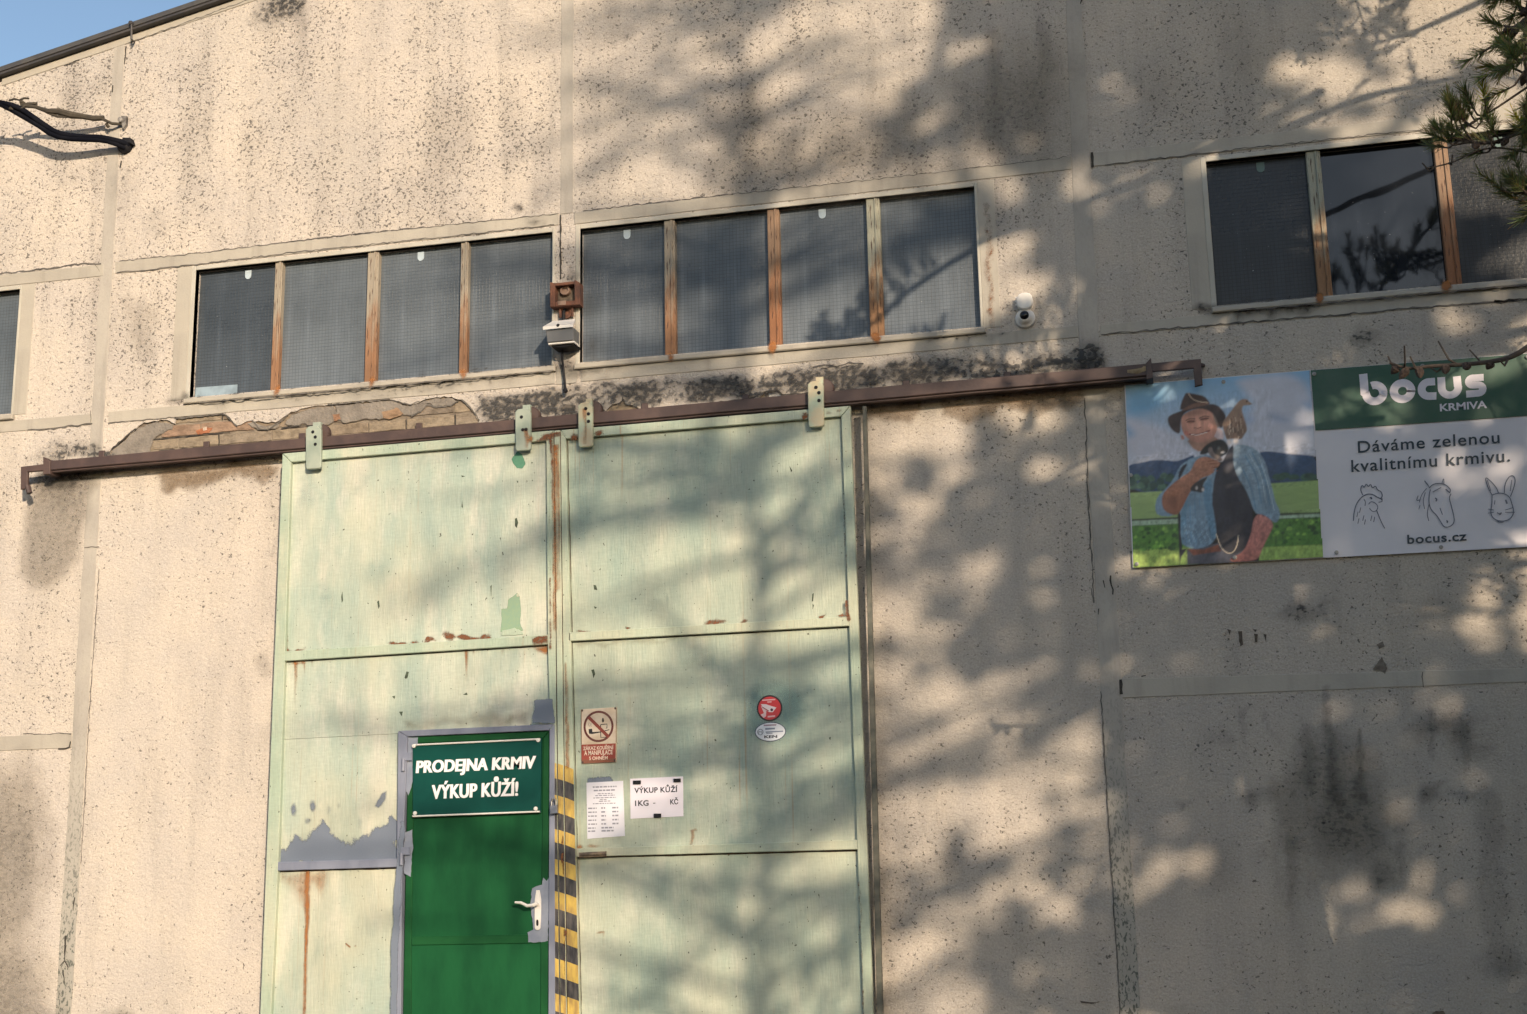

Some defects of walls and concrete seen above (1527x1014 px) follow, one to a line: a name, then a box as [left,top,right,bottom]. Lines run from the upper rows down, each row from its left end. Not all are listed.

leakage [258,0,306,22]
leakage [478,344,1104,420]
spalling [110,397,480,456]
corrosion [524,430,602,654]
peeling [390,593,523,644]